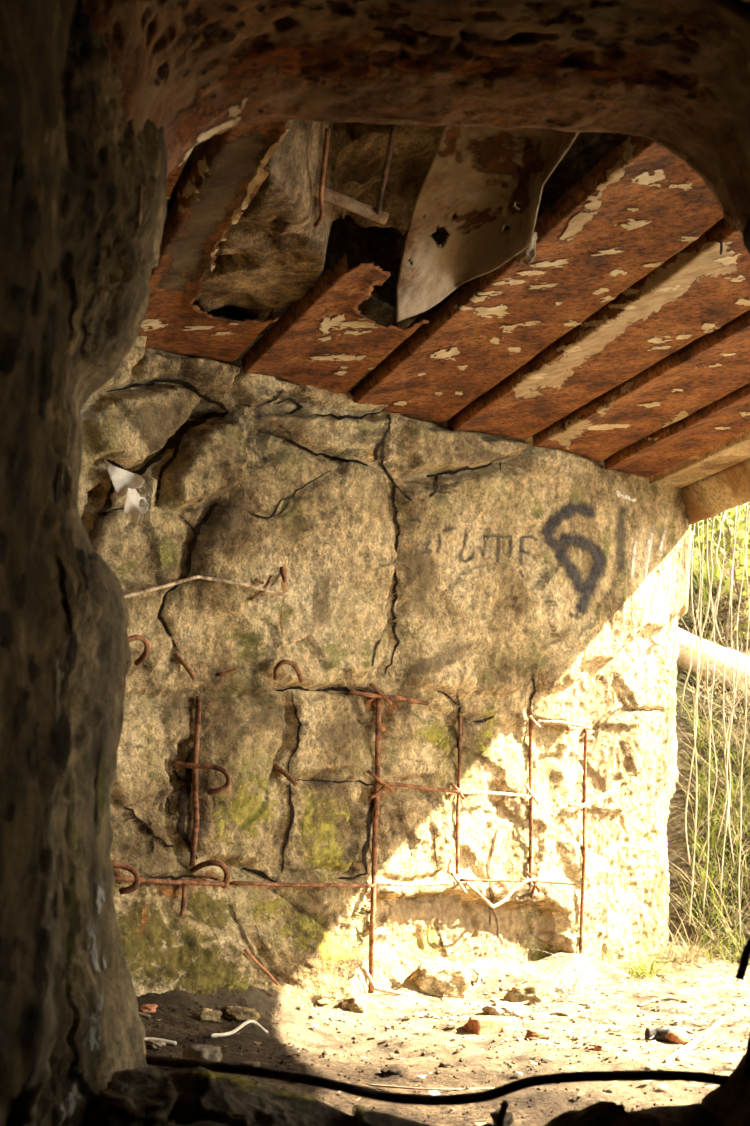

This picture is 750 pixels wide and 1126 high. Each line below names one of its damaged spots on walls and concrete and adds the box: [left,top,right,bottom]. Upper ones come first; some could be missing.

spalling [166,98,248,216]
corrosion [438,126,544,235]
peeling [512,136,746,399]
peeling [454,259,569,354]
peeling [308,314,379,376]
peeling [430,347,468,371]
peeling [548,377,661,449]
crack [91,379,501,940]
crack [528,675,536,720]
crack [590,691,662,760]
corrosion [140,869,232,933]
crack [231,908,280,981]